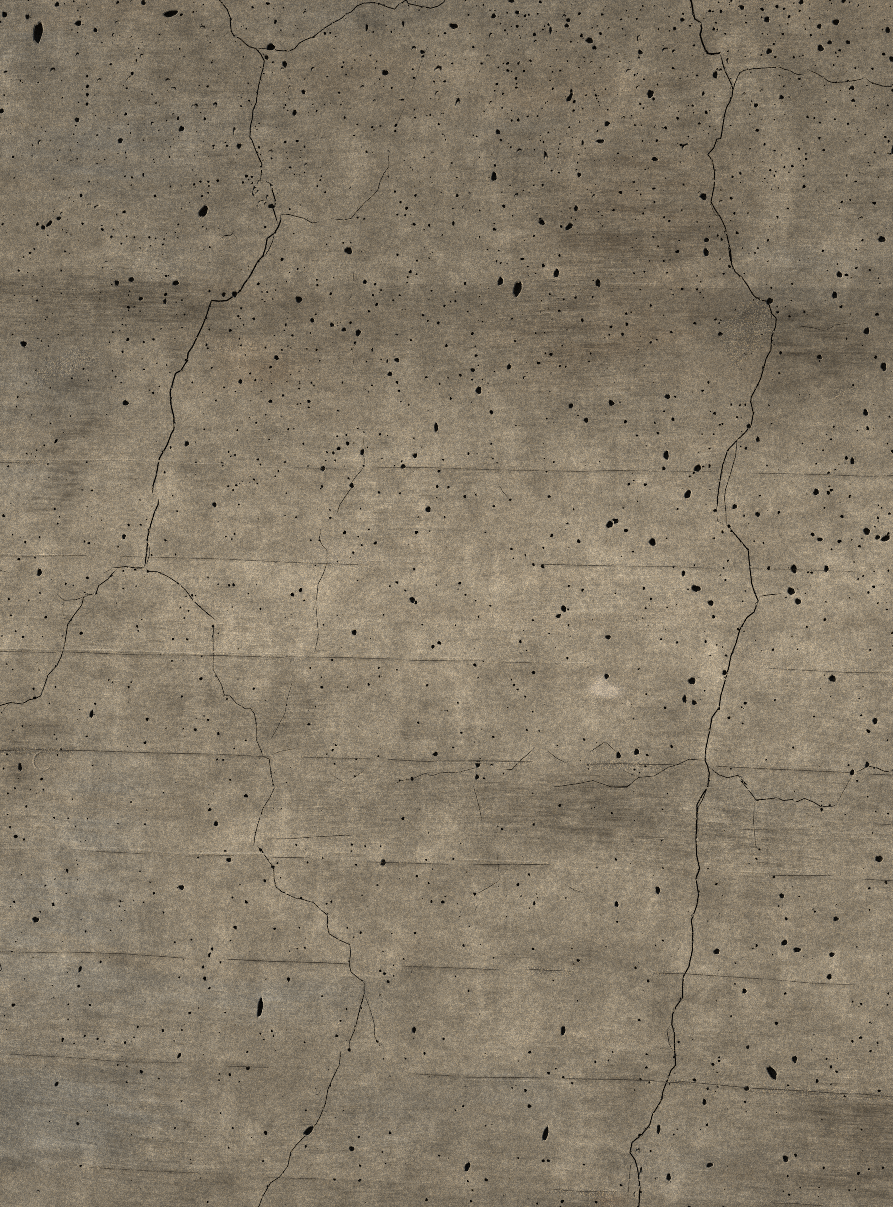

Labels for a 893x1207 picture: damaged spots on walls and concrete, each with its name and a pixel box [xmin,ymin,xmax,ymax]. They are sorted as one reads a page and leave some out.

crack [0,0,445,1207]
crack [393,0,893,1207]